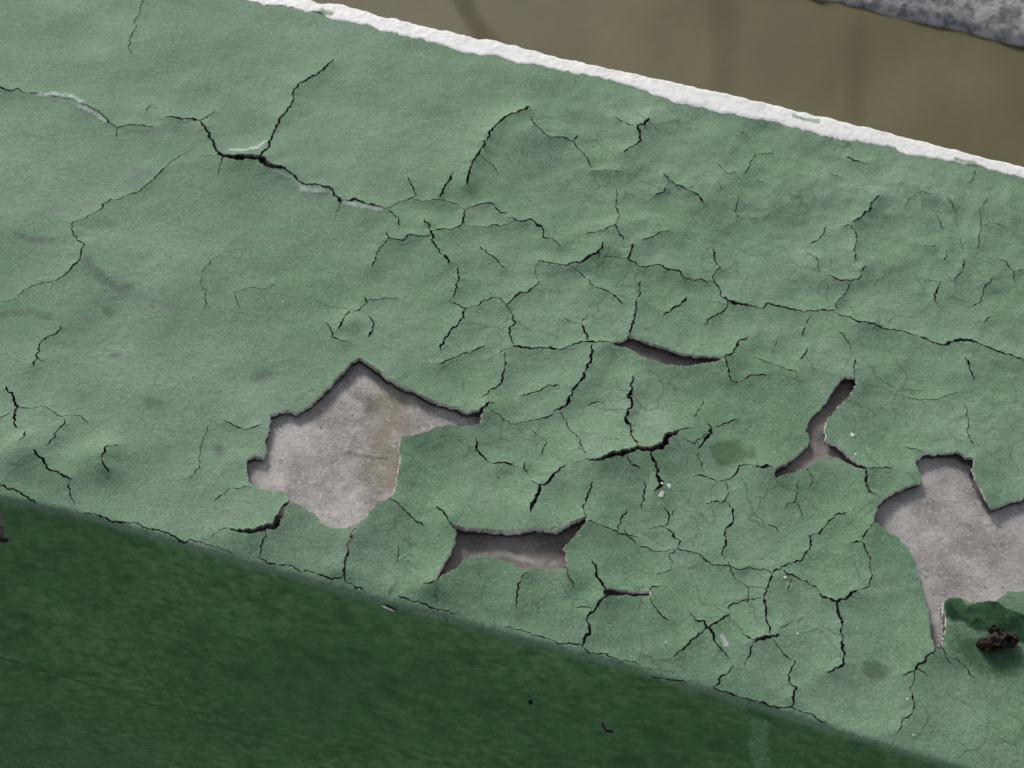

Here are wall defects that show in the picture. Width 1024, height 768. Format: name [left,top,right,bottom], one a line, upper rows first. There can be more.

crack [0,86,154,138]
crack [4,148,193,302]
crack [31,325,61,368]
crack [0,386,364,590]
peeling [247,357,484,535]
peeling [434,515,587,589]
crack [166,59,1024,734]
peeling [610,336,725,366]
peeling [773,376,860,477]
peeling [873,451,1024,654]